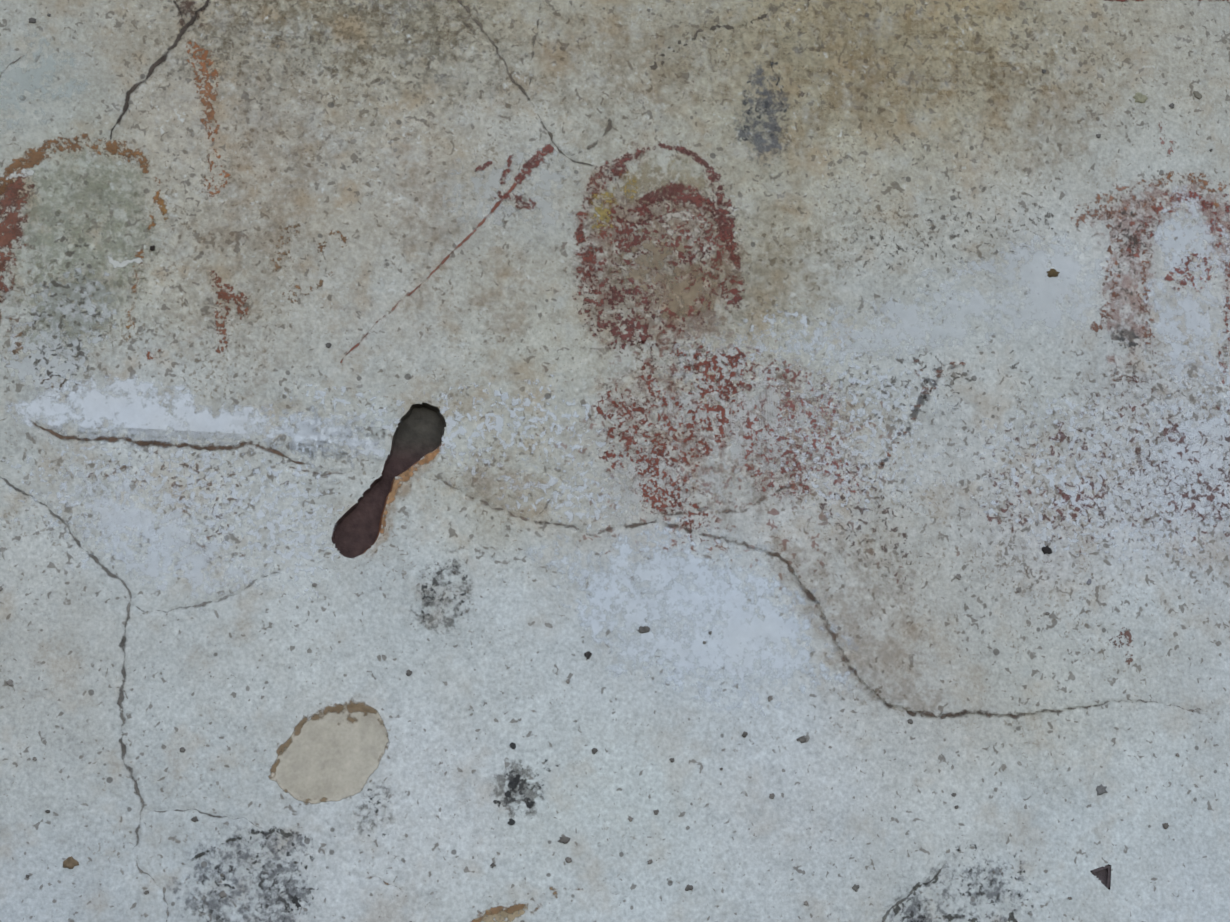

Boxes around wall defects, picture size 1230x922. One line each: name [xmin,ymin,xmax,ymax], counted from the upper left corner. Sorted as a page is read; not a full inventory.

crack [110,0,209,139]
damp [738,61,787,154]
spalling [331,402,446,558]
damp [421,561,468,629]
crack [482,485,861,682]
crack [2,478,278,916]
spalling [269,700,389,805]
crack [885,700,1194,719]
damp [174,828,318,922]
spalling [472,904,538,922]
damp [893,844,1033,922]